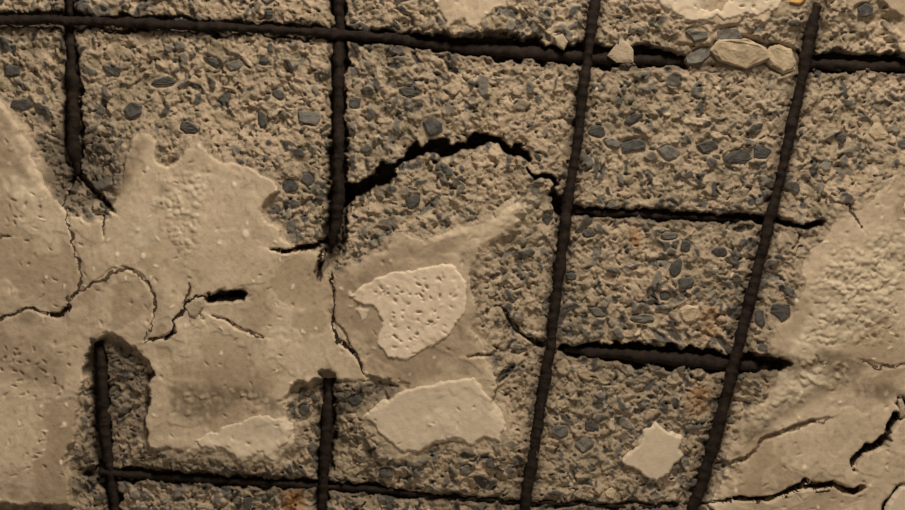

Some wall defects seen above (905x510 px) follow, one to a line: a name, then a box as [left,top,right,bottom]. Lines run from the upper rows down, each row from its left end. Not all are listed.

crack [0,172,264,343]
spalling [0,0,584,510]
crack [269,239,364,374]
spalling [333,0,905,510]
crack [858,360,903,371]
crack [703,412,898,510]